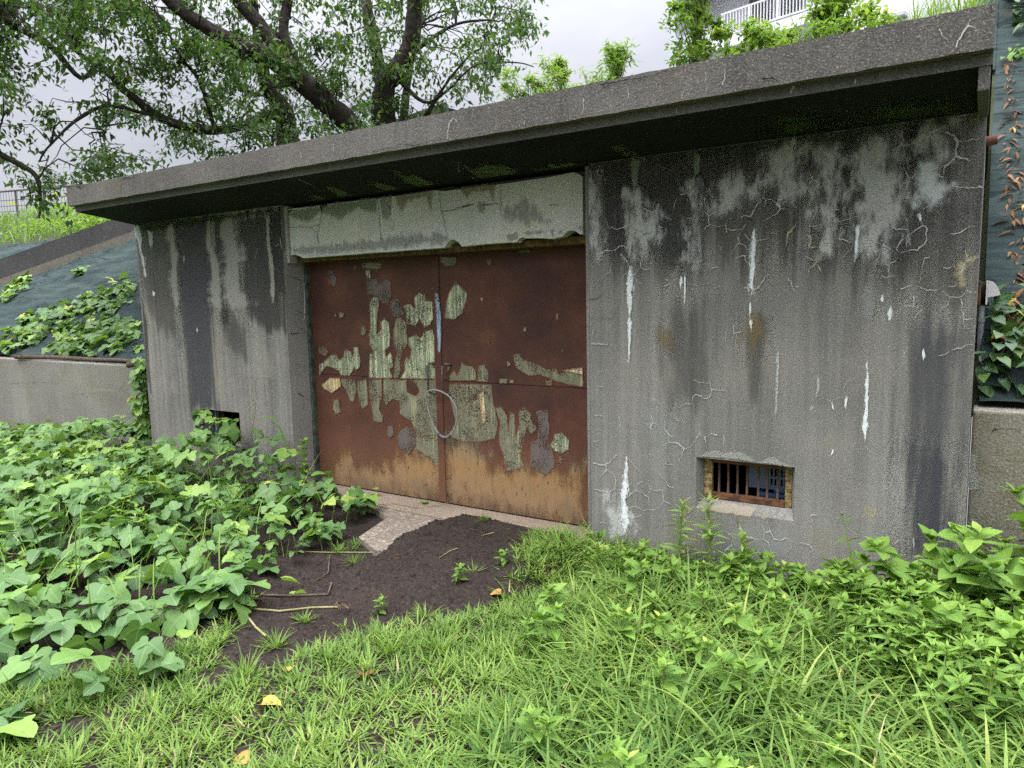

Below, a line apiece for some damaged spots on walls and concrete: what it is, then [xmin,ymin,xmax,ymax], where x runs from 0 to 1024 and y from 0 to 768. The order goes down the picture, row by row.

leakage [134,199,376,410]
leakage [588,115,960,363]
crack [588,131,983,356]
leakage [957,256,978,286]
corrosion [325,435,588,526]
leakage [602,457,638,540]
crack [593,370,725,525]
crack [725,513,819,554]
leakage [908,327,946,546]